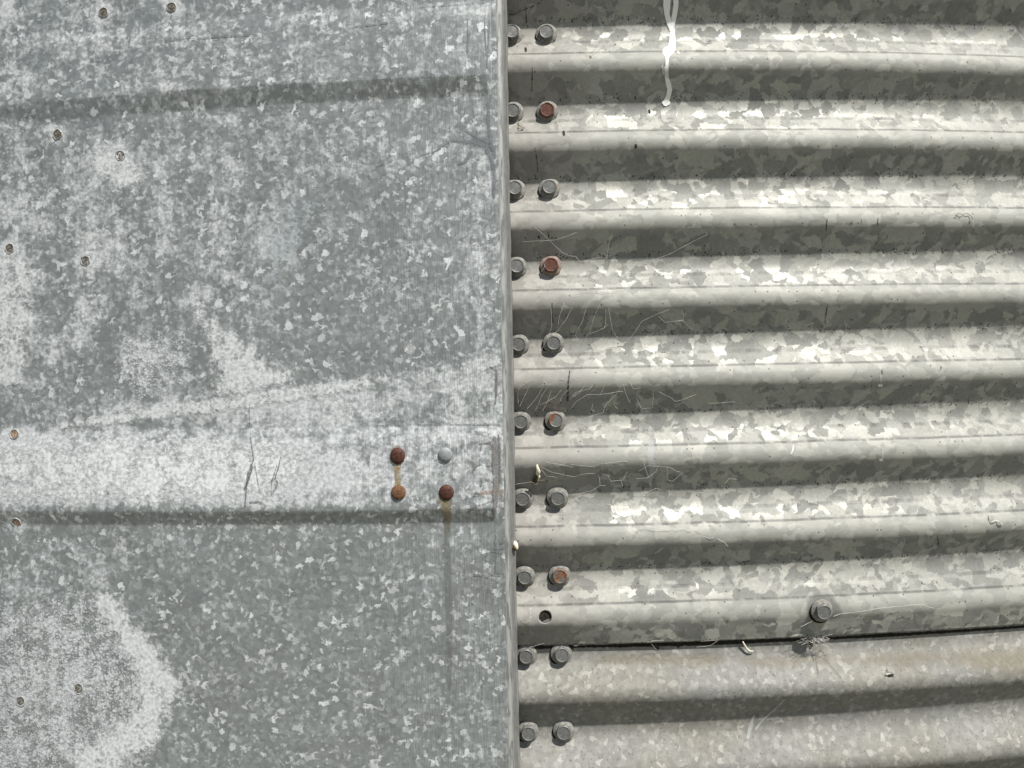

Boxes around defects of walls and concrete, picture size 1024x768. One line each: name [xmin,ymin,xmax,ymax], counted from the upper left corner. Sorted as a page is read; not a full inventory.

rust [439,497,451,533]